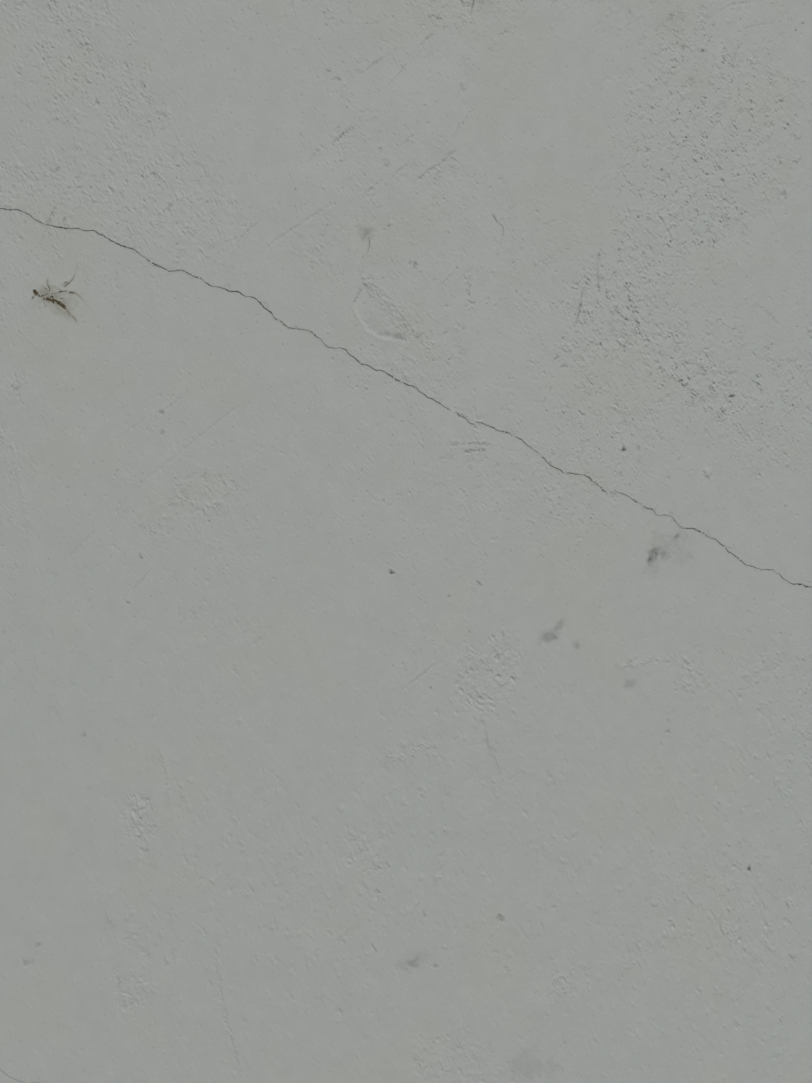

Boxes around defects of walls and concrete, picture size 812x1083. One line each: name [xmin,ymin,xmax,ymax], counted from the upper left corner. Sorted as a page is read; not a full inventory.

crack [0,207,812,589]